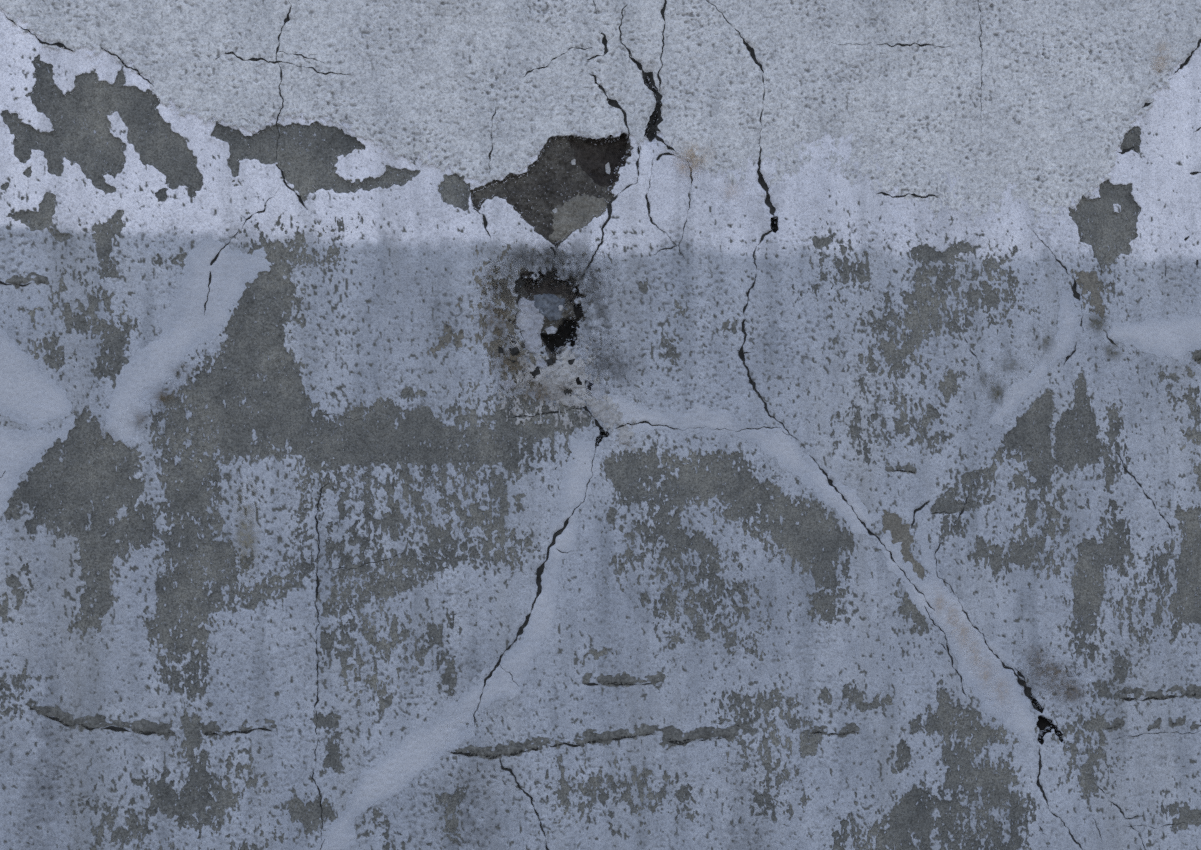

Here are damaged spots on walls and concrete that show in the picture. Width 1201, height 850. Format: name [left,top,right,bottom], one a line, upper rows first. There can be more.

crack [5,15,73,51]
peeling [0,54,203,202]
crack [102,48,153,85]
crack [473,0,1044,723]
peeling [792,219,1042,482]
crack [1034,232,1117,365]
peeling [1069,179,1141,319]
peeling [0,121,855,850]
peeling [931,358,1201,800]
crack [500,758,549,850]
peeling [798,674,1039,850]
crack [1037,750,1185,850]